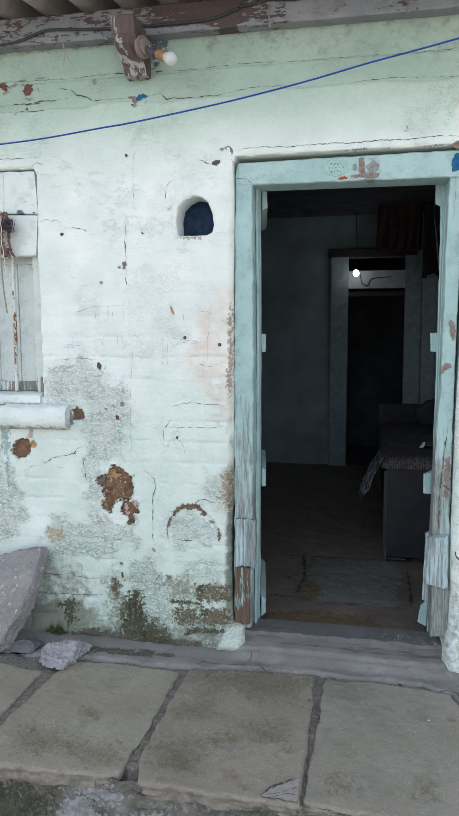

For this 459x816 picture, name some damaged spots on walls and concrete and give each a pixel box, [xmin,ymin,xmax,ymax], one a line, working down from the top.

peeling [0,77,45,100]
crack [2,72,281,115]
spalling [70,406,85,425]
spalling [10,429,37,458]
spalling [95,464,140,525]
spalling [167,503,222,541]
damp [72,591,202,657]